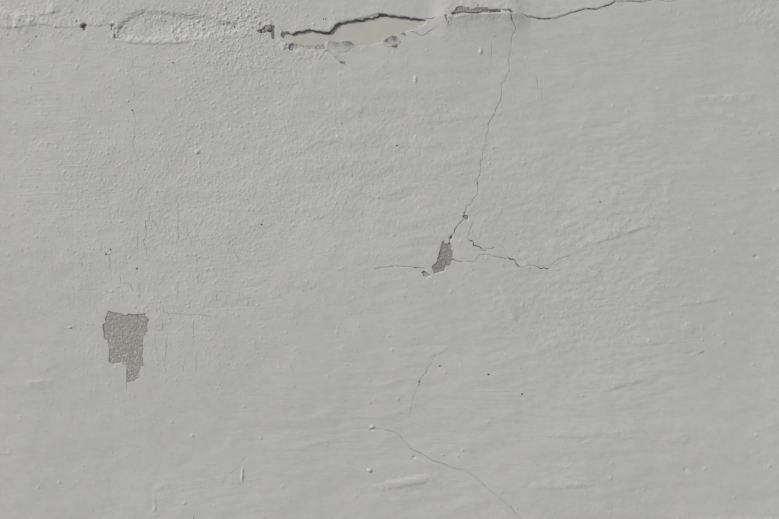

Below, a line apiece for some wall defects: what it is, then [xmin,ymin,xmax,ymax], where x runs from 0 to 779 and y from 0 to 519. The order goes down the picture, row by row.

spalling [286,14,423,35]
crack [449,0,669,269]
peeling [422,236,453,277]
peeling [102,311,149,383]